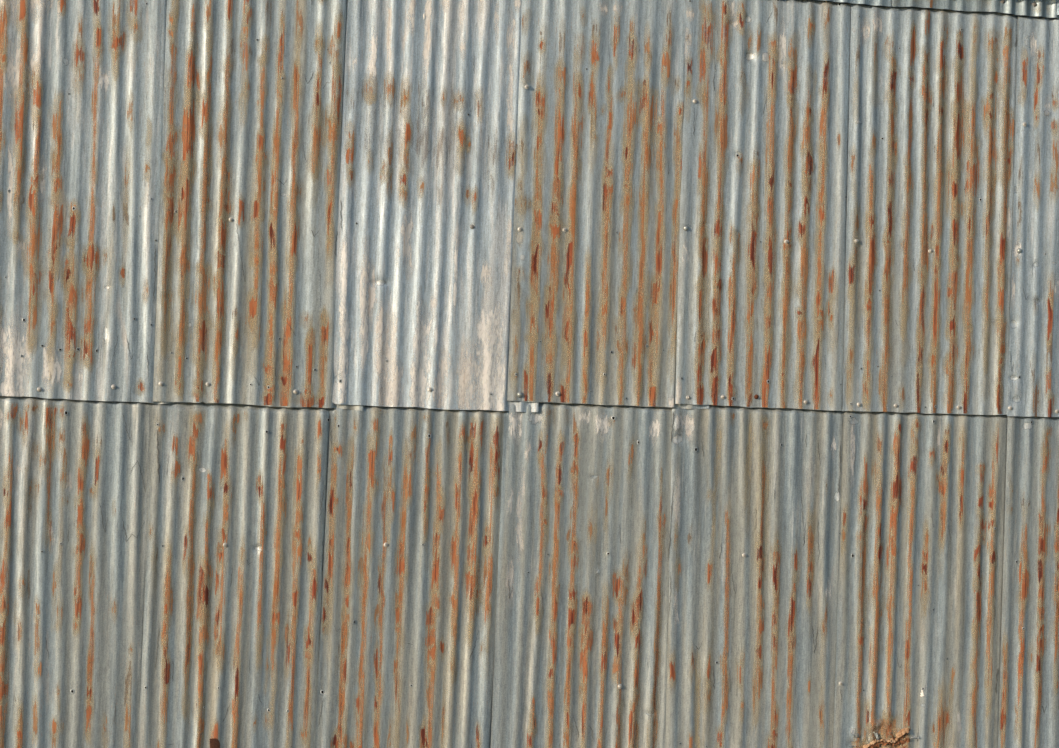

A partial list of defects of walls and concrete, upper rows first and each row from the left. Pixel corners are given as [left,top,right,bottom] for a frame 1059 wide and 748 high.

corrosion [0,454,42,748]
corrosion [7,404,102,734]
corrosion [0,0,138,386]
corrosion [156,0,329,748]
corrosion [312,10,354,250]
corrosion [256,410,500,748]
corrosion [366,77,412,201]
corrosion [458,125,471,157]
corrosion [506,2,840,420]
corrosion [689,420,814,748]
corrosion [969,280,1059,748]
corrosion [1034,119,1059,198]